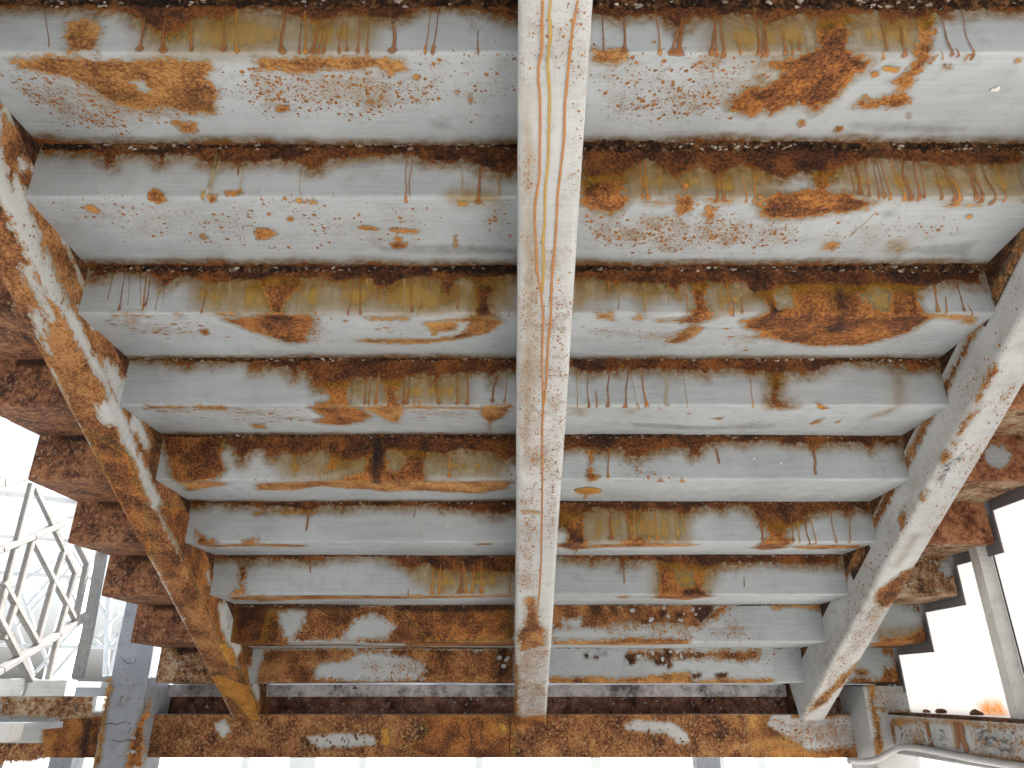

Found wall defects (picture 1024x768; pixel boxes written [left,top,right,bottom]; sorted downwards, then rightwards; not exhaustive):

rust [447,61,515,126]
rust [0,102,33,196]
rust [71,188,283,252]
rust [278,194,329,222]
rust [300,208,425,249]
rust [565,126,1024,254]
rust [152,319,214,339]